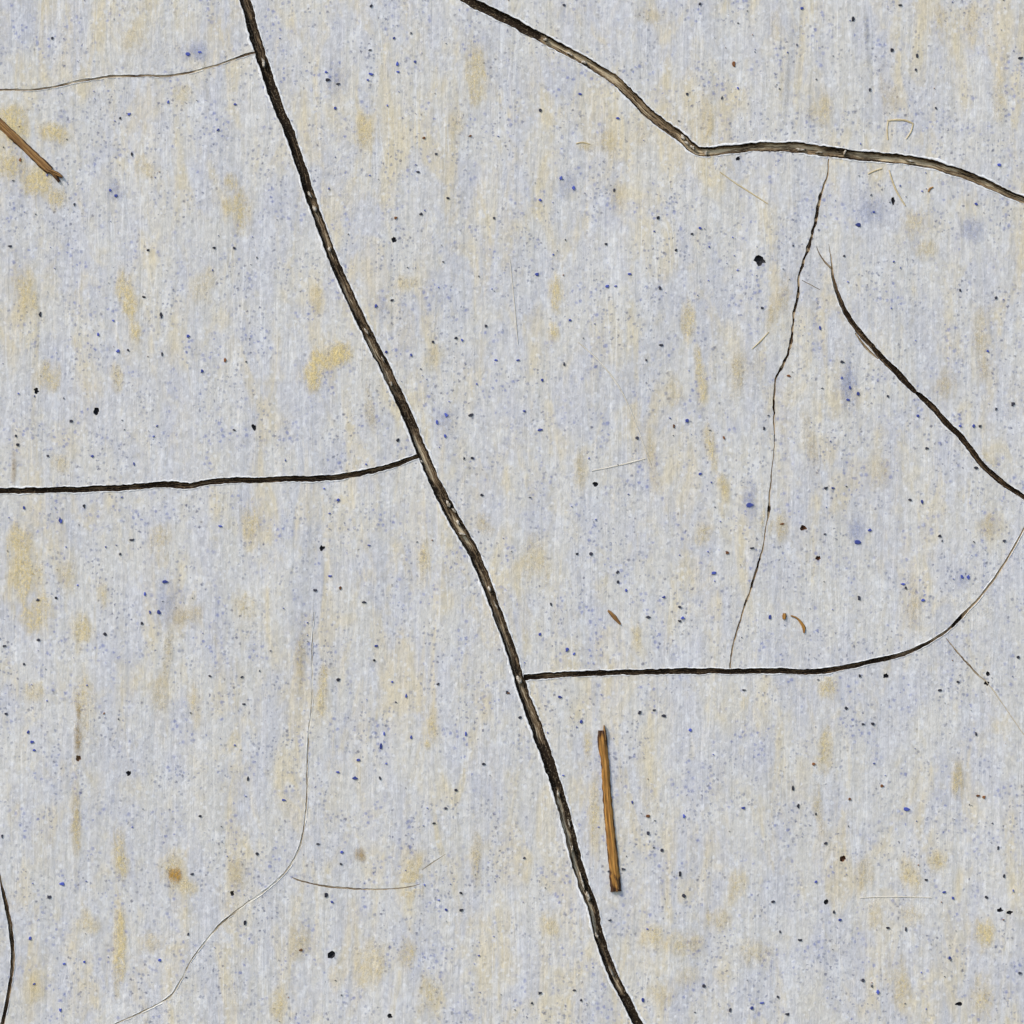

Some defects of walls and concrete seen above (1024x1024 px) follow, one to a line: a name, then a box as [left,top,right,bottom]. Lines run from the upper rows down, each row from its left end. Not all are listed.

crack [458,0,1024,203]
crack [0,0,646,1024]
crack [523,159,1024,681]
crack [946,638,1024,735]